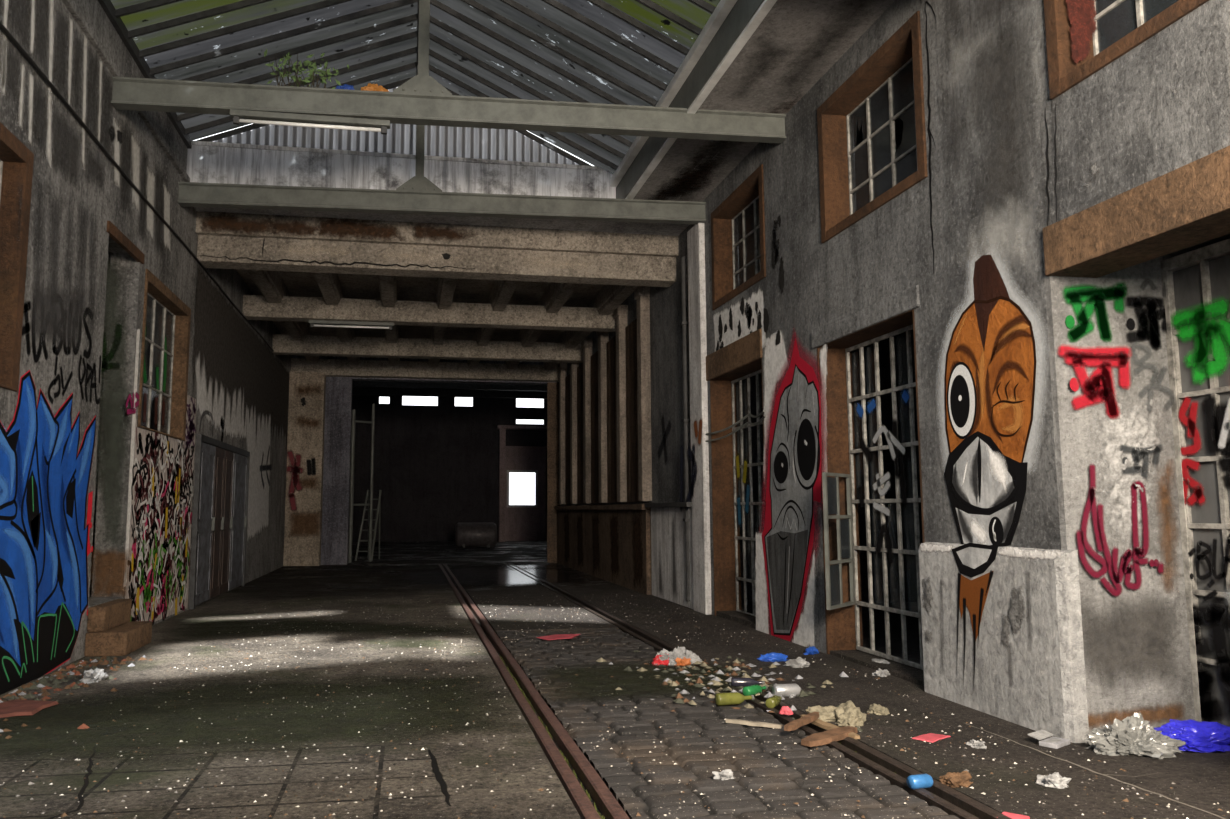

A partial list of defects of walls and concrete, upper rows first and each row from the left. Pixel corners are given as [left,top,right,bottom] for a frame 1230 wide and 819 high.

damp [1,0,171,251]
damp [656,141,740,199]
crack [1045,105,1057,226]
crack [49,746,96,819]